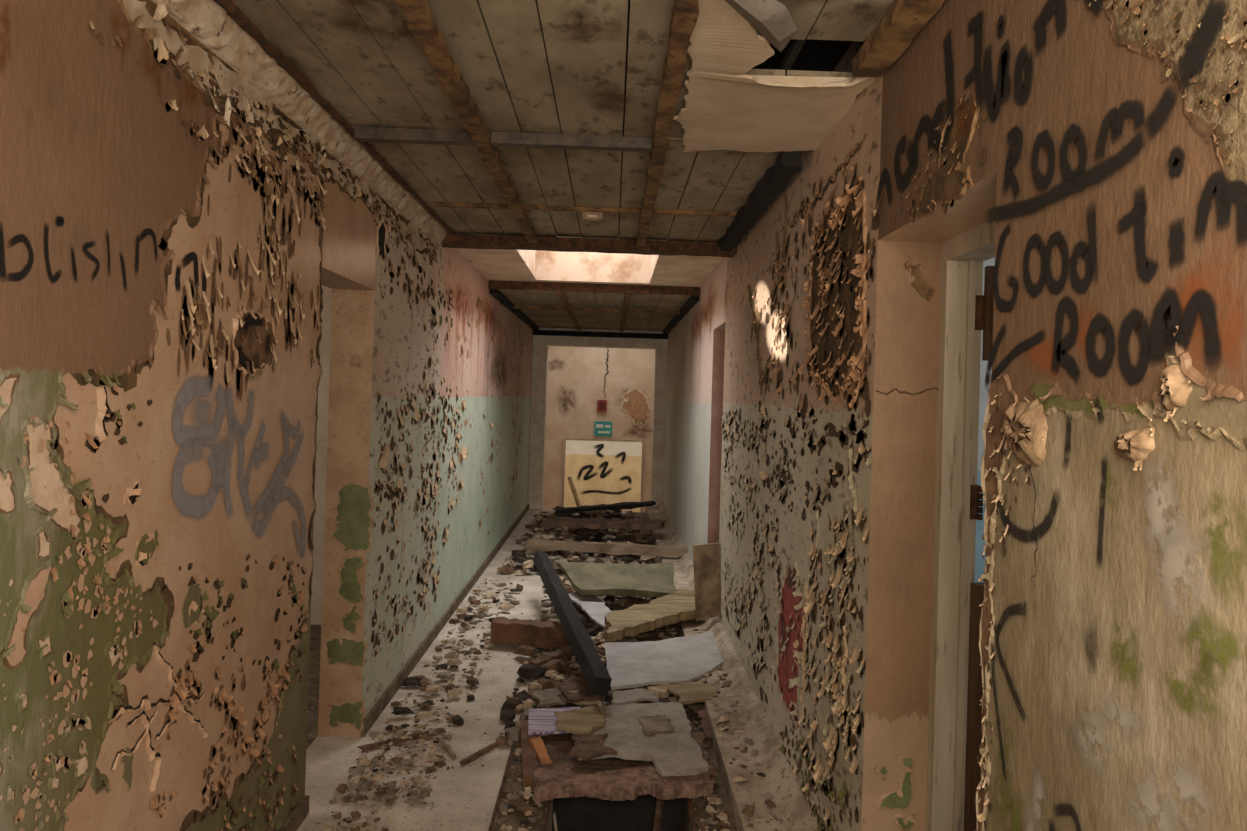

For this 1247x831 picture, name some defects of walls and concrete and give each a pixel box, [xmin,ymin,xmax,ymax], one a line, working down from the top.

peeling [0,0,526,831]
spalling [721,162,882,831]
spalling [1089,0,1247,184]